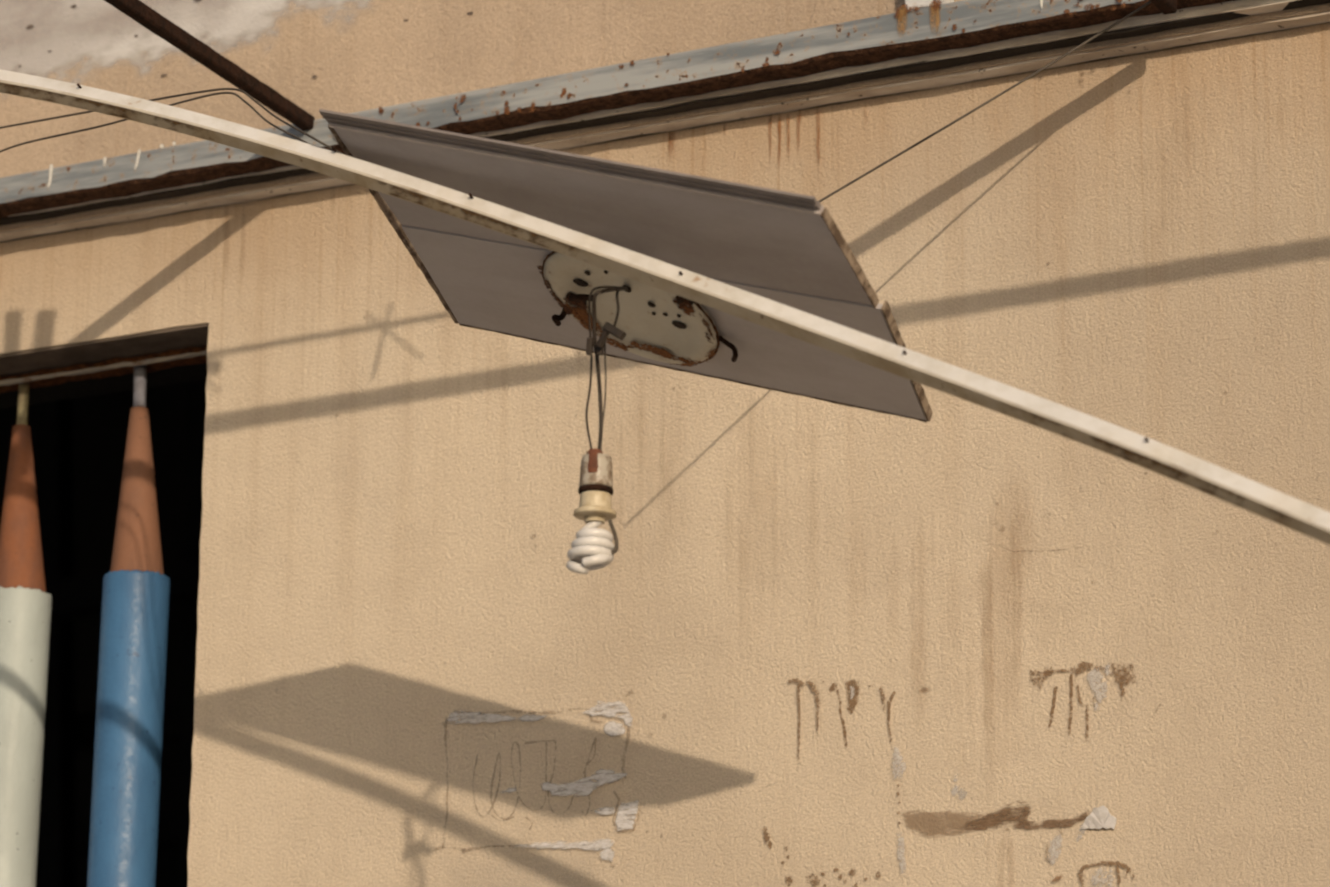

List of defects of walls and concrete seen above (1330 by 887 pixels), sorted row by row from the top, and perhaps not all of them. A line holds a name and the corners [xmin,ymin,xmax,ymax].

peeling [0,0,180,84]
peeling [140,0,369,53]
rust [894,0,976,33]
rust [2,83,134,119]
rust [379,181,426,206]
rust [442,202,575,250]
rust [537,265,716,367]
peeling [1077,805,1117,841]
peeling [763,826,792,887]
peeling [809,868,881,887]
spalling [1078,861,1134,887]